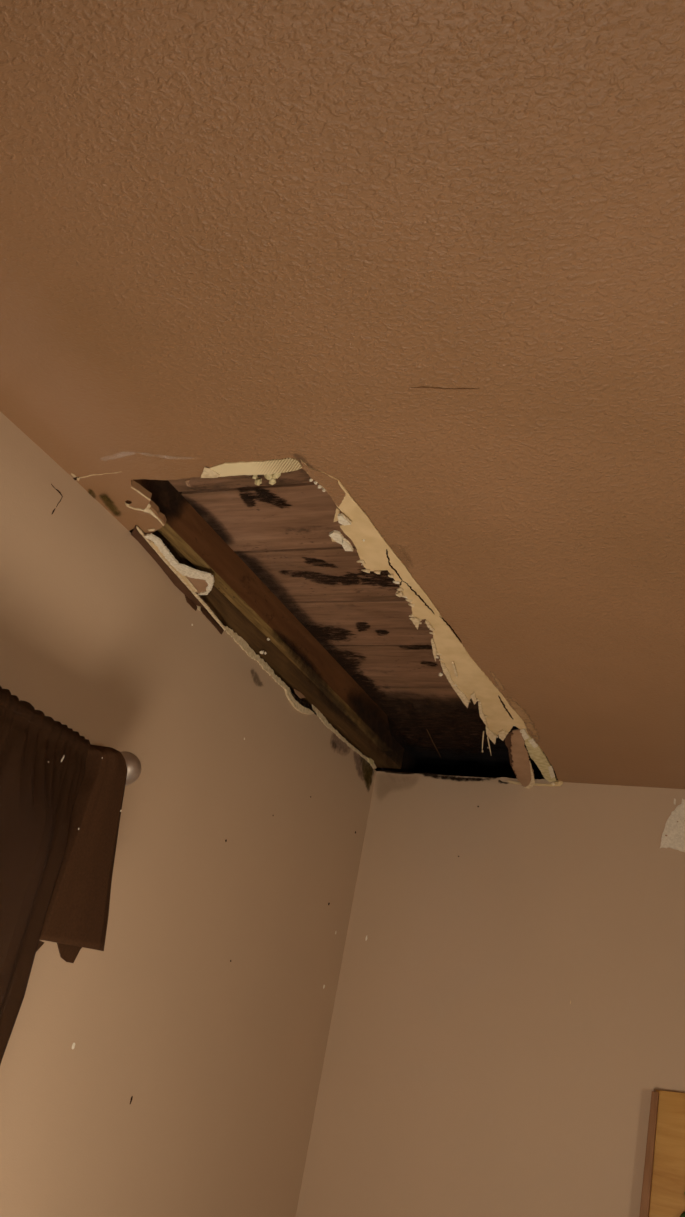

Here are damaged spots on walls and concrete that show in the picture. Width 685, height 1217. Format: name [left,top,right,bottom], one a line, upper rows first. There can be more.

peeling [329,513,353,551]
peeling [131,525,291,692]
leakage [145,479,508,790]
spalling [312,705,377,769]
peeling [520,728,538,748]